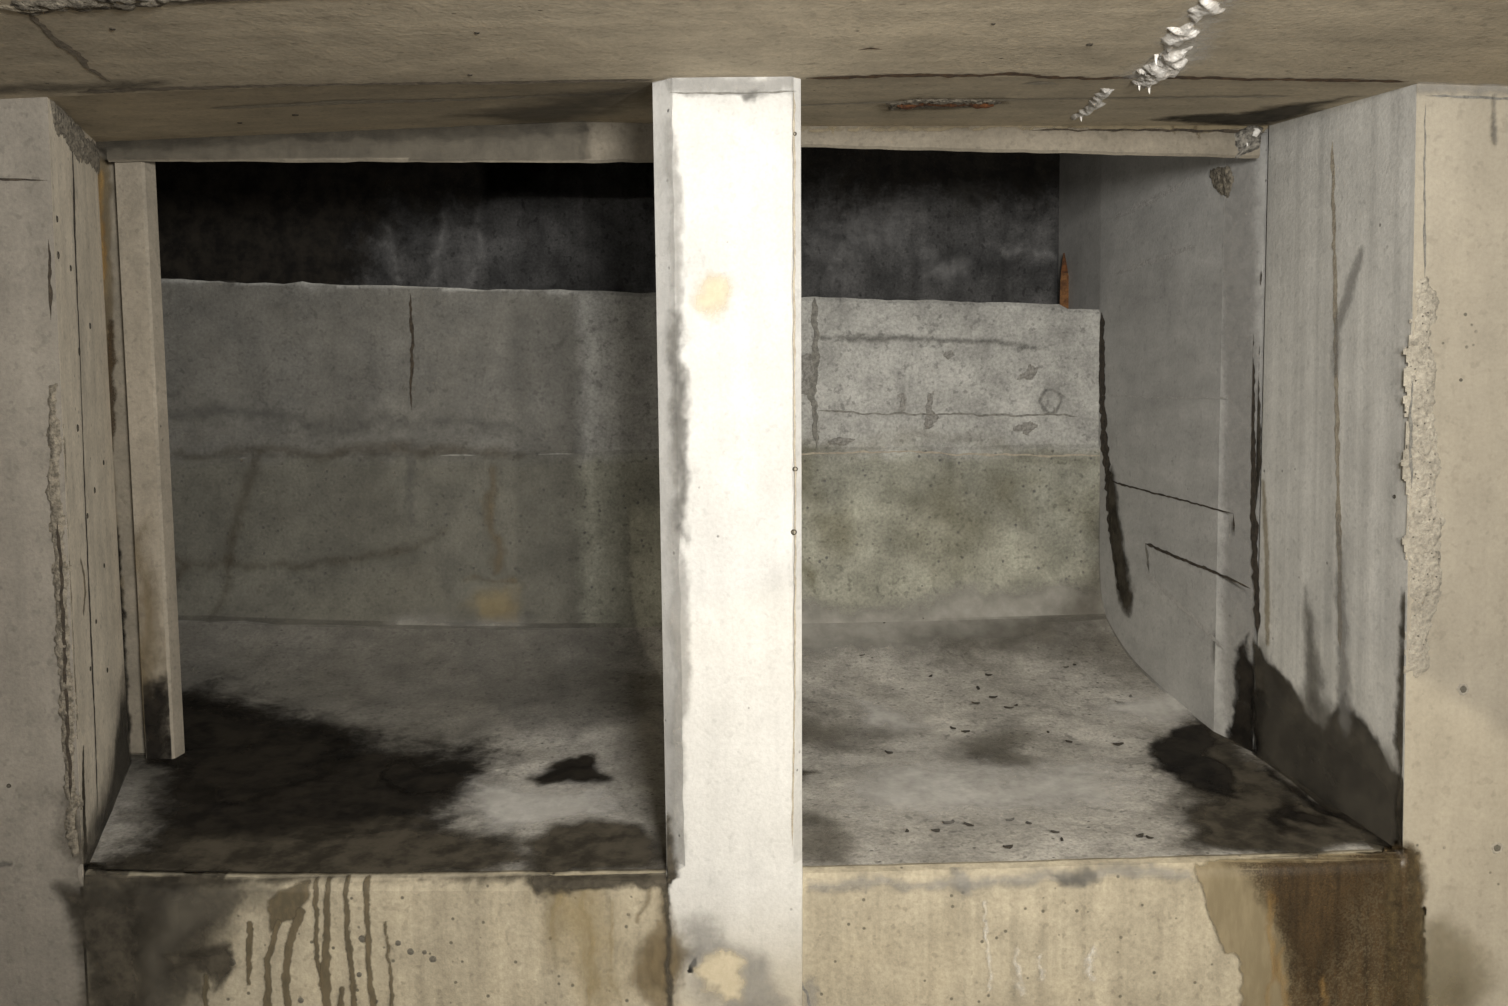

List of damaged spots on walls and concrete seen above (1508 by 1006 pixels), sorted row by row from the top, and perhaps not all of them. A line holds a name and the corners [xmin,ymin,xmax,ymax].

damp [1131,0,1231,94]
damp [1071,88,1115,122]
damp [1158,101,1332,159]
damp [1109,335,1478,1006]
damp [867,739,1106,808]
damp [58,681,677,1006]
damp [695,952,745,1000]